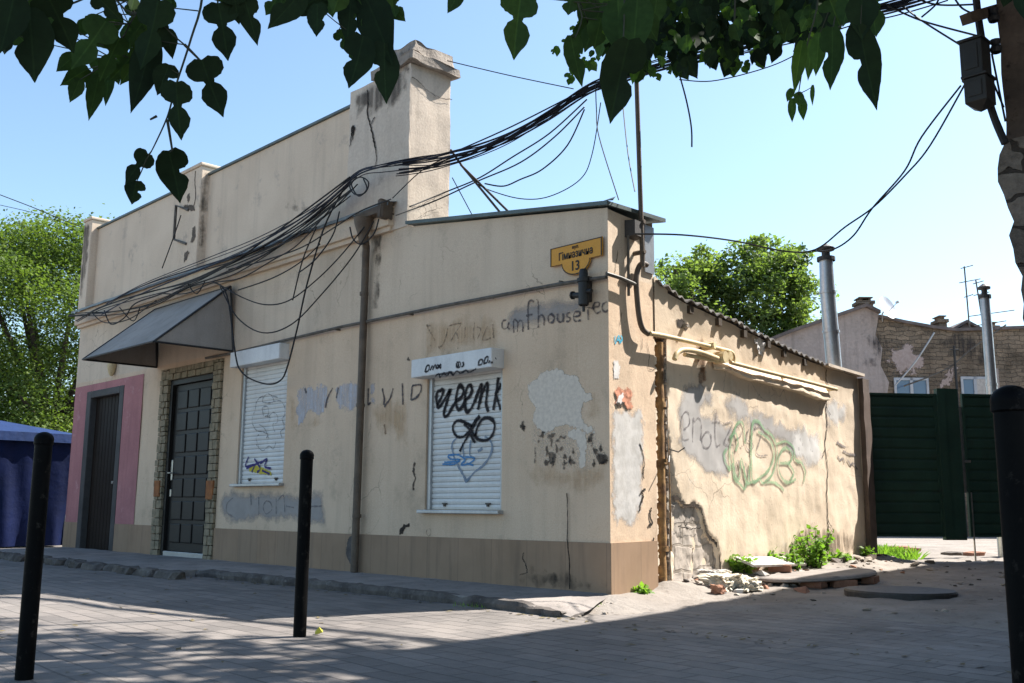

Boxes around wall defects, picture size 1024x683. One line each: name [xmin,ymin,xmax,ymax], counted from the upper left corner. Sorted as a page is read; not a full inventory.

crack [349,90,377,165]
peeling [528,368,595,468]
spalling [613,360,633,410]
spalling [654,339,721,581]
crack [822,369,834,549]
flaking render [887,344,924,375]